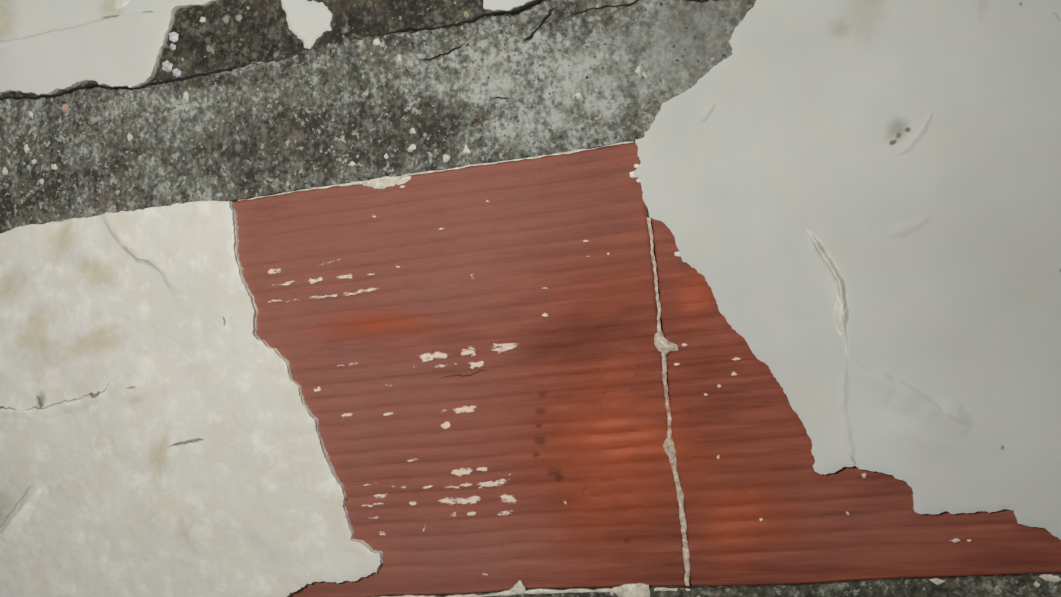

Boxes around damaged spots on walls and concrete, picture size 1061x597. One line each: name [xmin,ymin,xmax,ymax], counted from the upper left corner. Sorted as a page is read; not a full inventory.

spalling [0,0,219,95]
crack [371,0,638,60]
spalling [230,201,384,580]